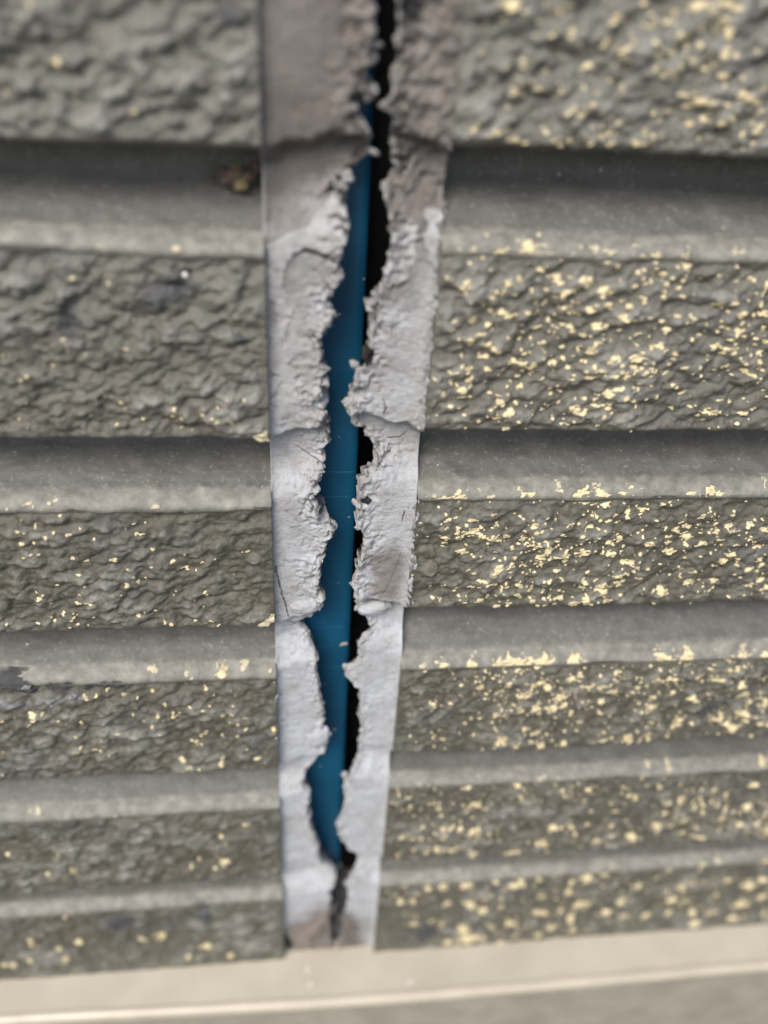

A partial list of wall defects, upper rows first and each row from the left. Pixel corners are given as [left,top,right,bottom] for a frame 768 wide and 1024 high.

crack [275,0,408,741]
crack [304,692,361,943]